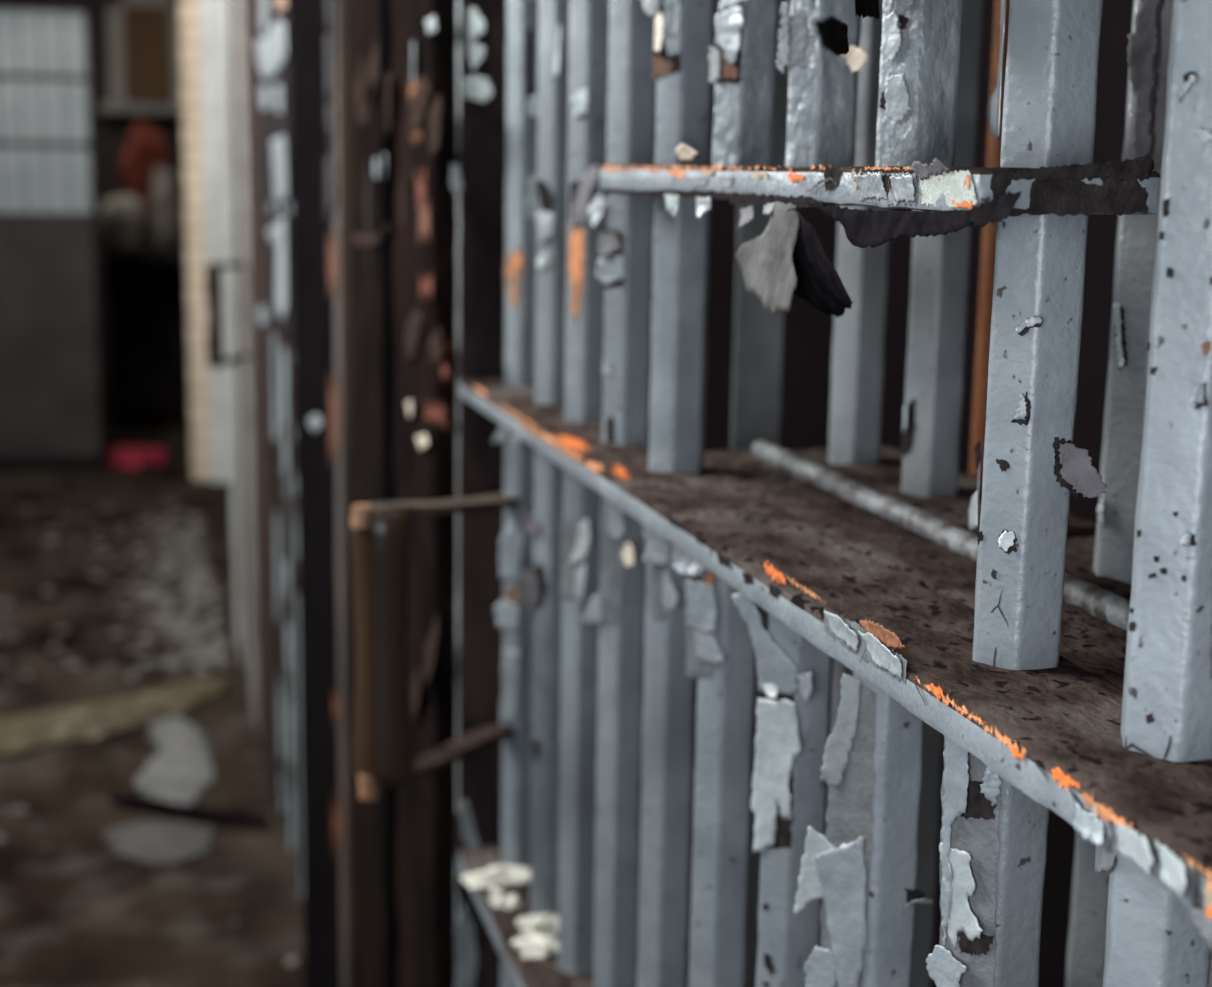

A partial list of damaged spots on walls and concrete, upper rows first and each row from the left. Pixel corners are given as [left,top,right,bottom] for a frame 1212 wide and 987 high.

rust [603,164,825,183]
peeling [569,0,1174,317]
rust [851,166,912,190]
rust [474,384,633,480]
spalling [1148,556,1186,582]
peeling [494,498,876,987]
rust [914,679,1026,764]
rust [1051,767,1133,829]
peeling [903,735,1002,987]
rust [1184,854,1212,918]